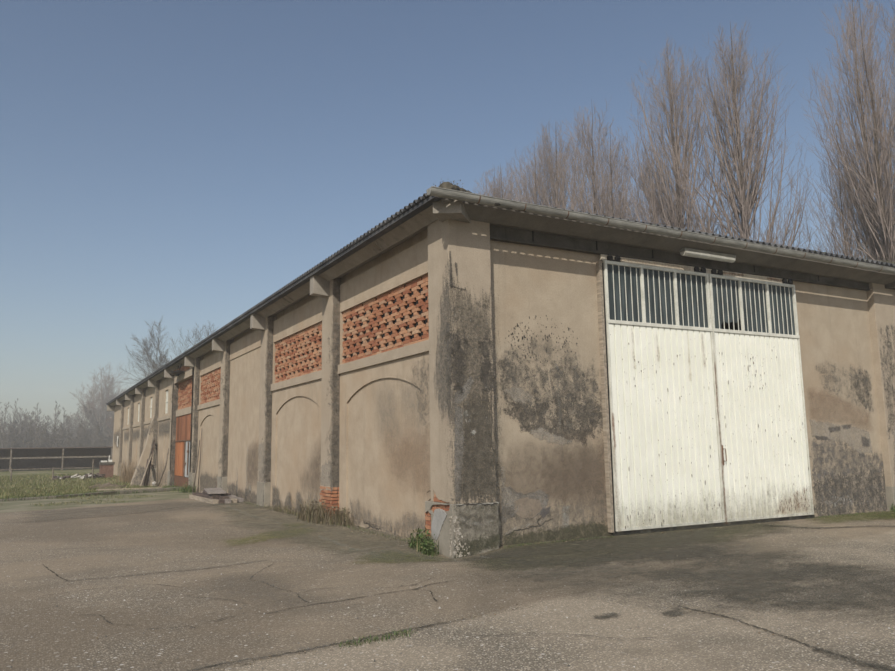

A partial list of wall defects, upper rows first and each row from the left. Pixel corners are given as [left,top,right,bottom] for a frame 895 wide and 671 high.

flaking render [319,462,339,519]
peeling [425,379,474,559]
damp [415,251,895,617]